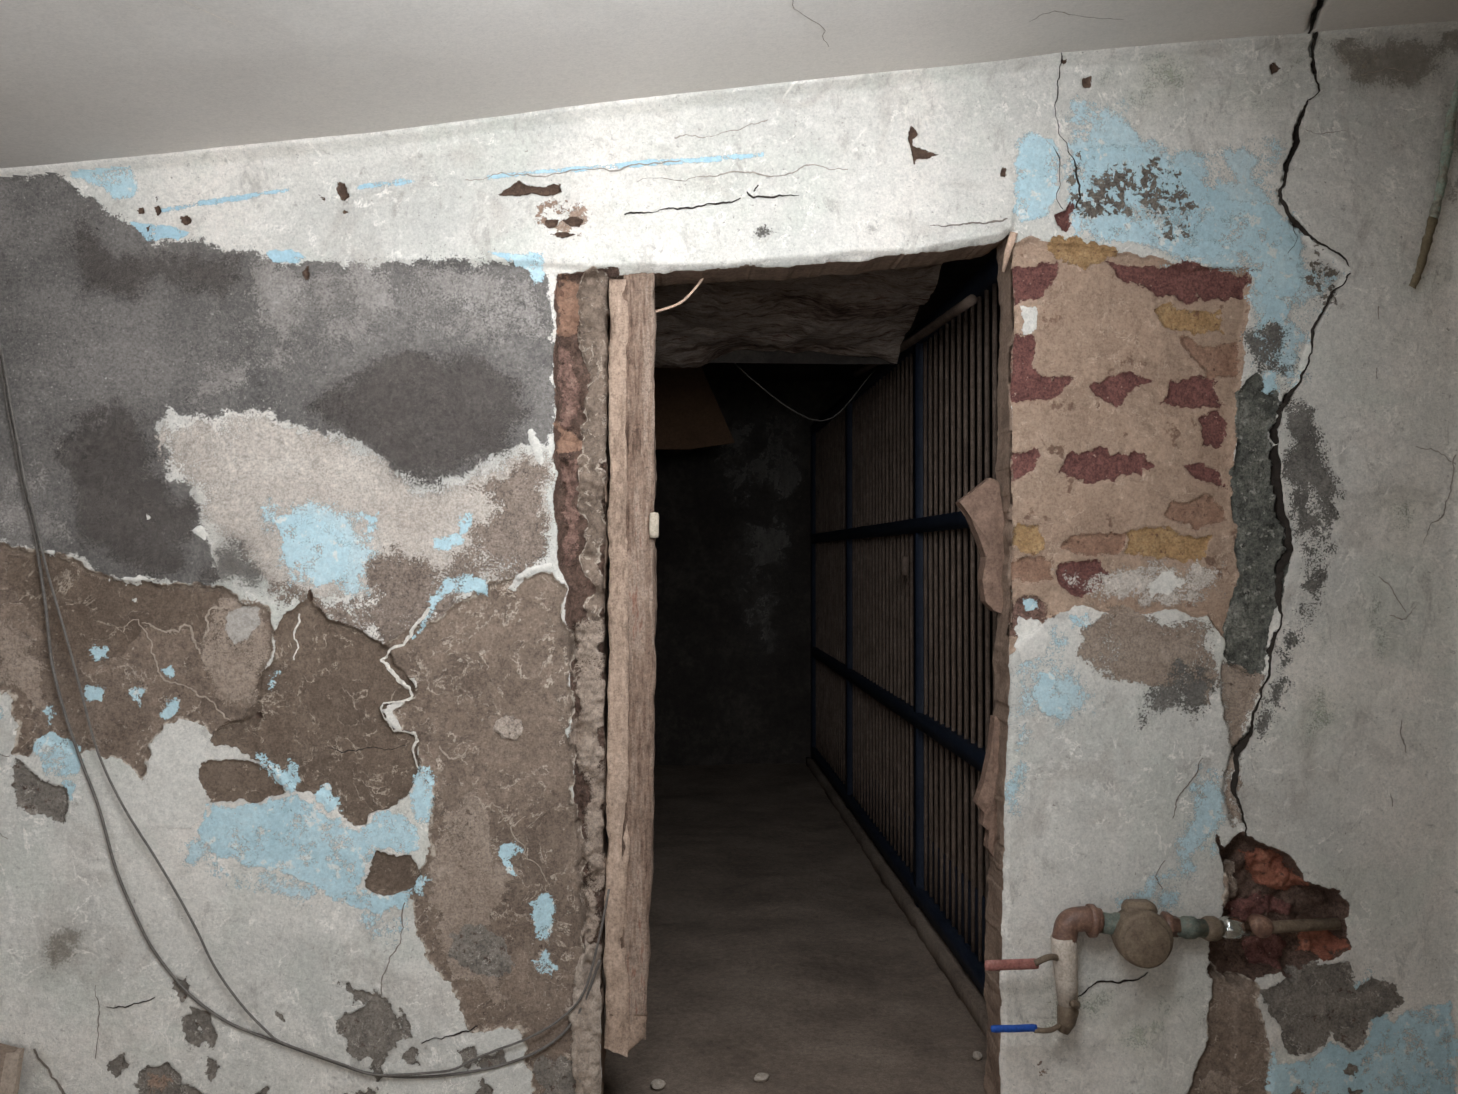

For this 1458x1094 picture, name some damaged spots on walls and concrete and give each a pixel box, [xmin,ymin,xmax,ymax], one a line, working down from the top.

damp [0,172,559,603]
spalling [498,180,562,196]
spalling [545,216,583,238]
crack [465,120,848,215]
crack [792,0,829,47]
crack [930,218,1008,227]
flaking render [1009,200,1254,663]
crack [1172,0,1351,837]
spalling [0,249,620,1094]
spalling [1187,660,1405,1094]